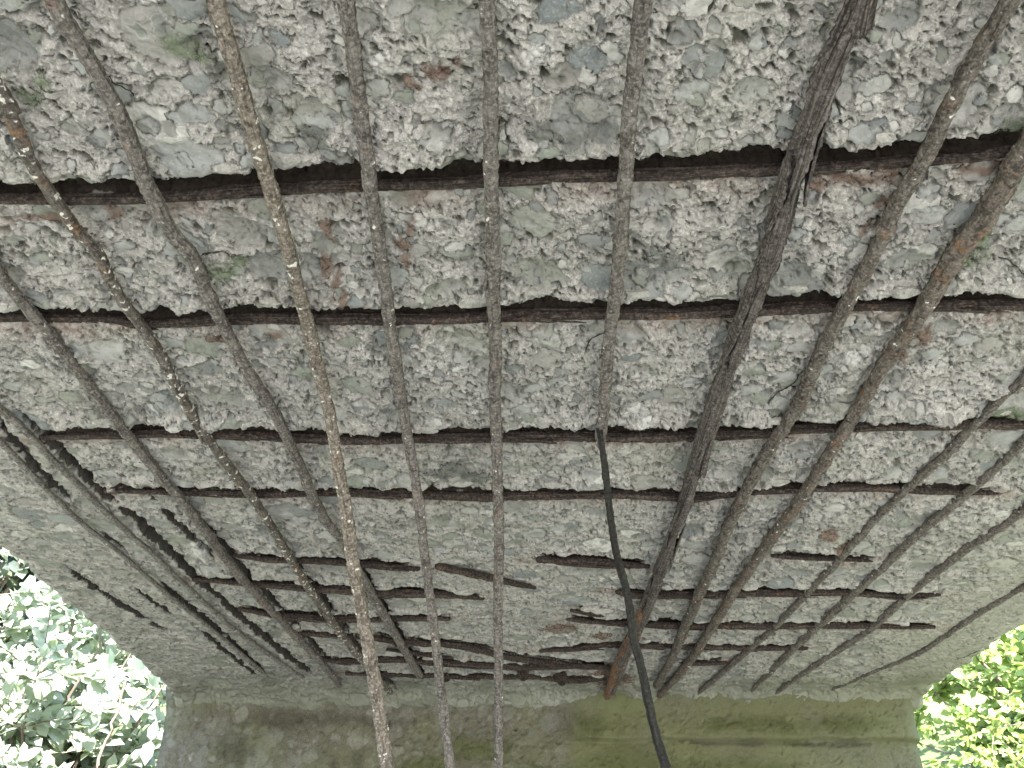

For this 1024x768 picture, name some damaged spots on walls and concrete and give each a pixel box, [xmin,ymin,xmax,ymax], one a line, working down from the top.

corrosion [404,58,461,89]
corrosion [34,212,61,221]
corrosion [394,219,415,267]
corrosion [810,153,898,235]
corrosion [320,255,347,309]
spalling [0,403,310,679]
corrosion [820,529,850,556]
spalling [736,372,1024,695]
spalling [361,568,434,695]
spalling [536,428,681,768]
spalling [697,630,791,695]
spalling [717,597,815,631]